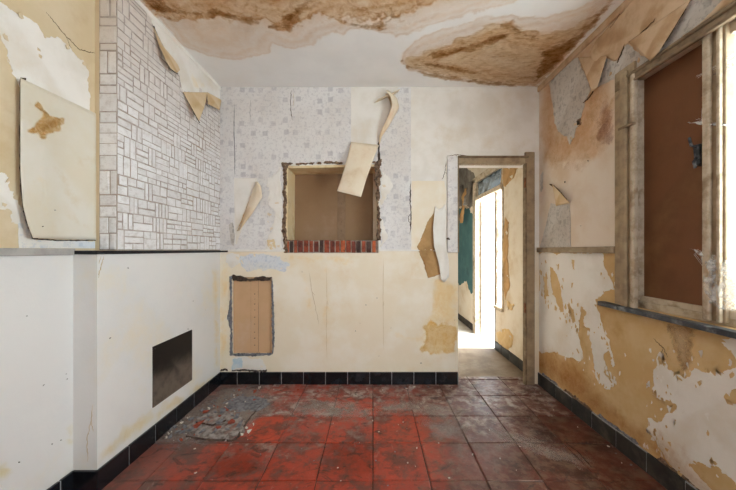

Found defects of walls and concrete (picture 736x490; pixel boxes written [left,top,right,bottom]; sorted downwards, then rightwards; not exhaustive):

peeling [0,2,91,110]
spalling [372,159,393,247]
peeling [500,168,518,187]
spalling [226,161,343,372]
peeling [503,217,515,310]
peeling [496,328,513,350]
peeling [539,252,621,390]
peeling [542,338,736,490]